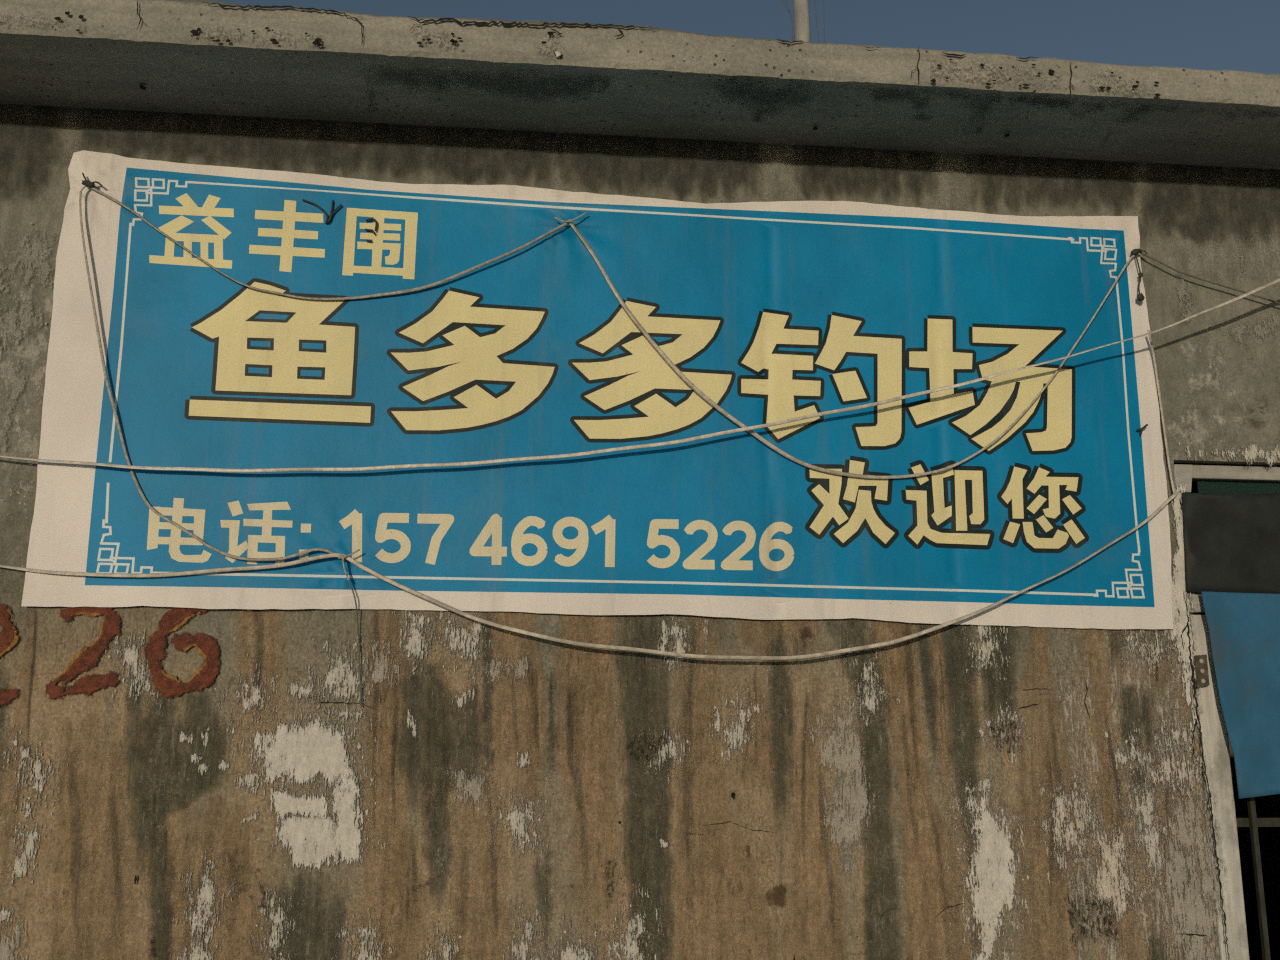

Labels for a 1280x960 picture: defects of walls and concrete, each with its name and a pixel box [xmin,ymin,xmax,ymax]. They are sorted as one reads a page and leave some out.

water stain [0,104,60,195]
water stain [82,108,756,198]
water stain [802,145,931,195]
water stain [978,154,1280,241]
water stain [52,683,344,960]
water stain [238,609,281,714]
peeling [179,609,530,873]
peeling [447,761,552,866]
water stain [364,609,845,960]
peeling [806,648,905,874]
water stain [844,618,1168,960]
peeling [941,480,1229,960]